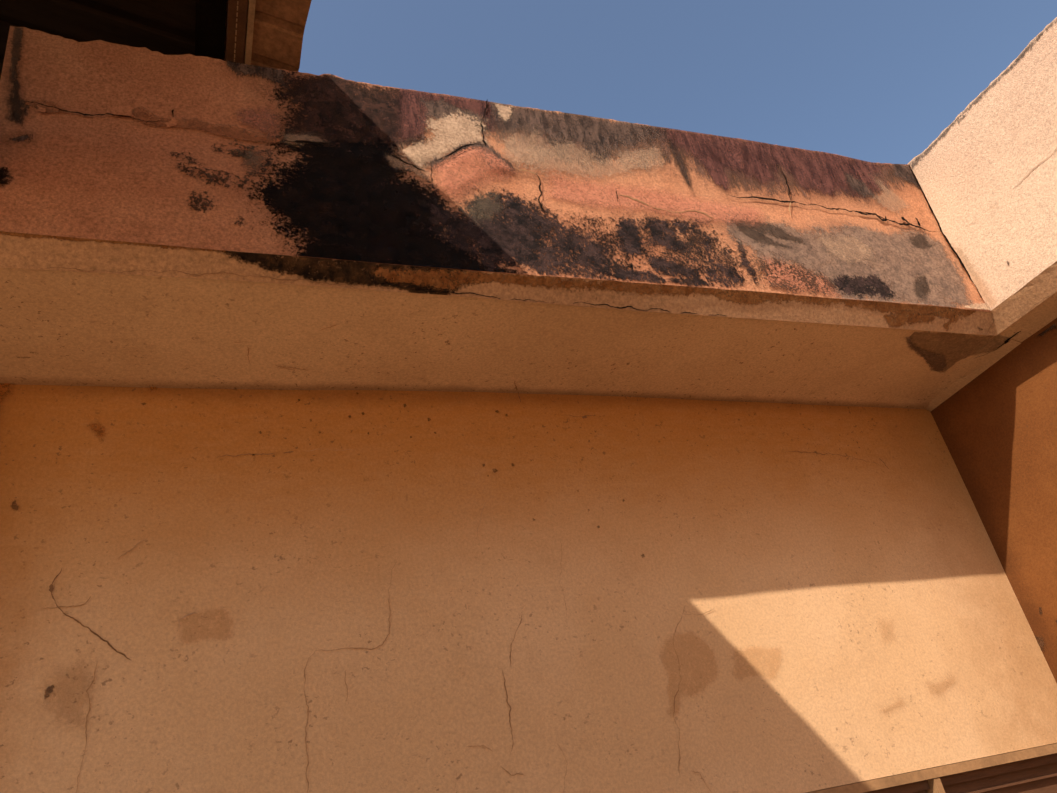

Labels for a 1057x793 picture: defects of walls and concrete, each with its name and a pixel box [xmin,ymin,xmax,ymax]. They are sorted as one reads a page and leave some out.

crack [27,101,174,122]
crack [38,267,725,316]
crack [476,100,488,145]
crack [513,167,547,213]
water stain [171,18,1057,310]
crack [616,191,715,219]
crack [733,165,1021,357]
crack [38,569,131,788]
crack [304,558,398,793]
crack [468,616,524,776]